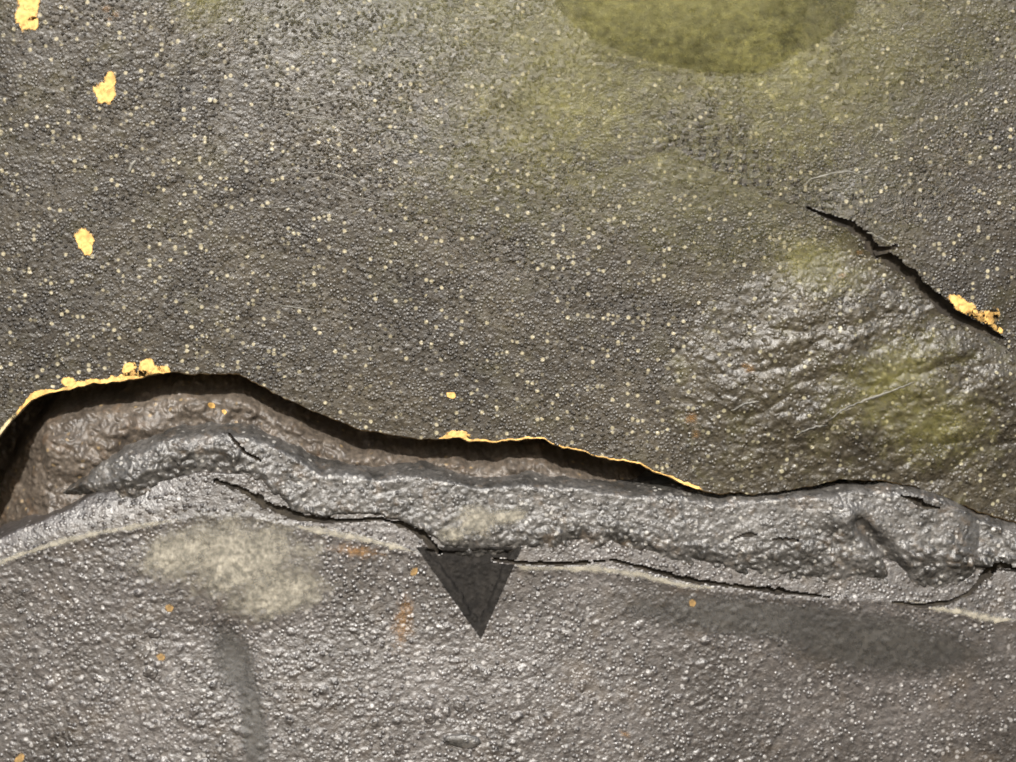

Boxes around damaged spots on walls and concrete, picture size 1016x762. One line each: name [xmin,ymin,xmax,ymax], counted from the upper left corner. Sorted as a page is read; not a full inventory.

crack [806,206,1004,339]
peeling [795,382,914,436]
crack [228,433,261,462]
spalling [0,359,768,528]
crack [214,478,440,553]
crack [731,532,797,542]
crack [900,494,938,509]
spalling [145,518,320,617]
spalling [411,546,522,639]
crack [493,557,828,598]
crack [892,561,1016,608]